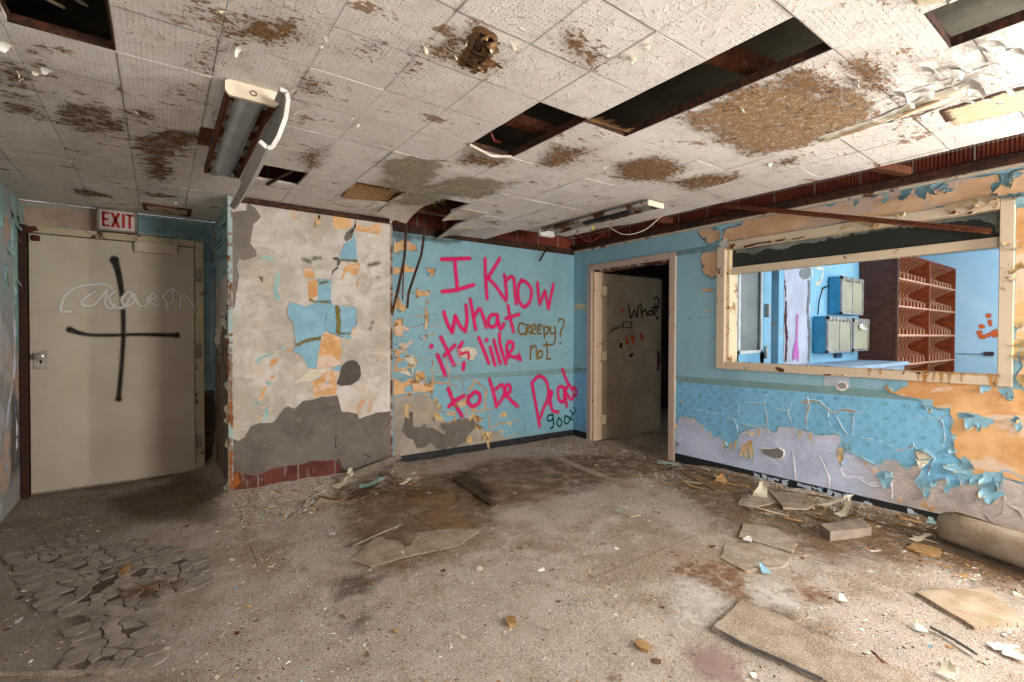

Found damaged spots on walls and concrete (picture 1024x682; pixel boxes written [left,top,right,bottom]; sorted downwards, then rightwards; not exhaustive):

peeling [0,40,15,53]
peeling [12,67,52,82]
water stain [0,36,202,200]
peeling [449,26,517,74]
water stain [674,47,905,172]
peeling [816,40,1024,142]
water stain [371,150,515,206]
water stain [528,143,598,170]
water stain [612,151,748,191]
peeling [138,201,513,490]
flaking render [674,168,1024,532]